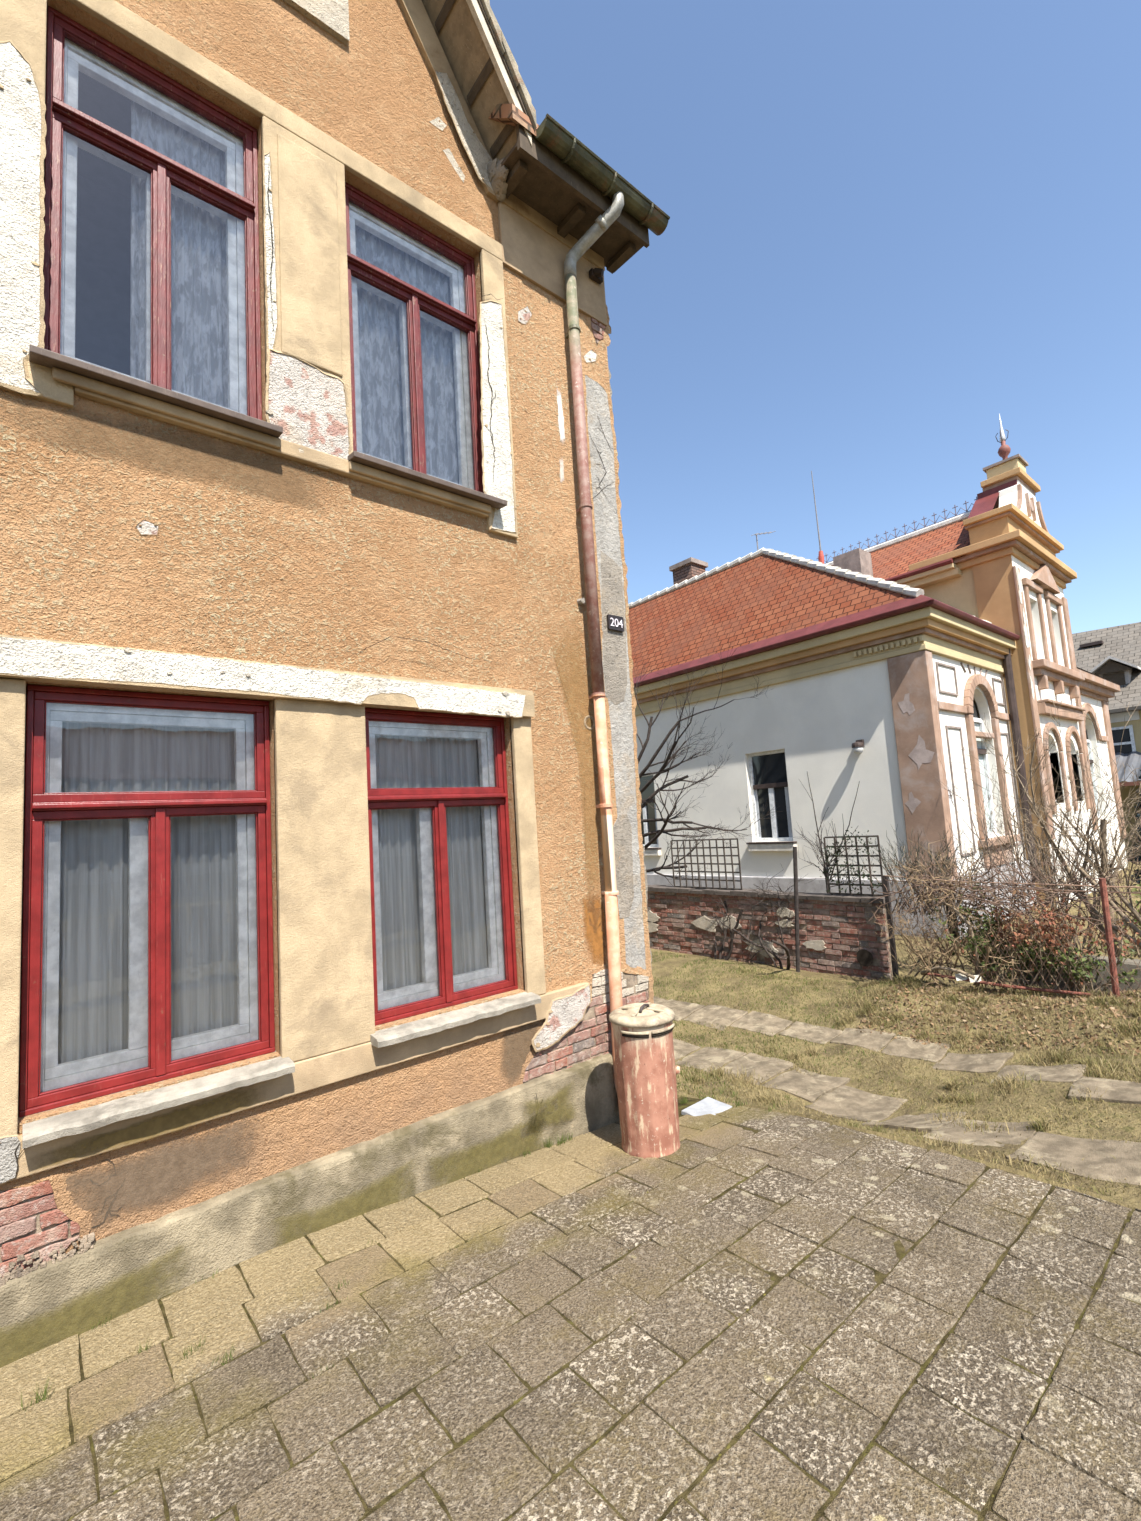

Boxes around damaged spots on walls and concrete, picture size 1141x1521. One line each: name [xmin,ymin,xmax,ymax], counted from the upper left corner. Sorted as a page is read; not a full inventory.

flaking render [263,152,352,469]
flaking render [134,518,160,537]
flaking render [0,635,526,718]
flaking render [514,305,654,1086]
flaking render [0,1135,100,1277]